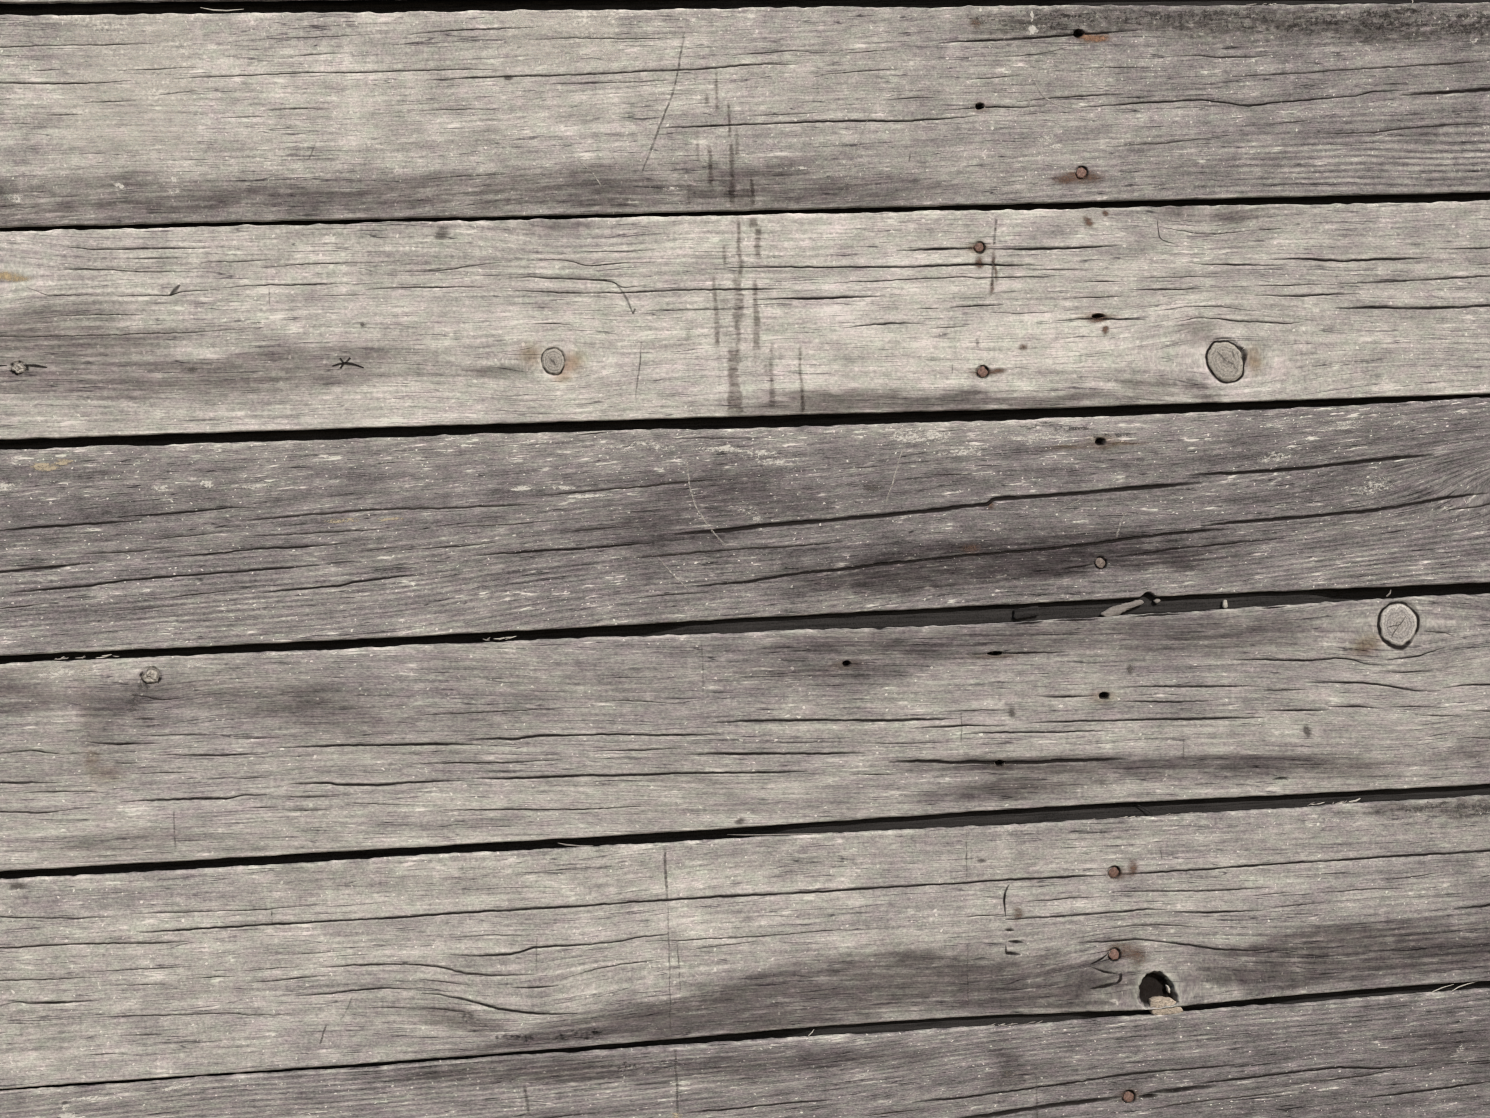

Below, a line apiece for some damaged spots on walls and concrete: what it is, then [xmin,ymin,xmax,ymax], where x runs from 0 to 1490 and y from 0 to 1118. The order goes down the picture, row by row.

crack [0,247,482,375]
crack [0,455,1490,612]
crack [0,850,1490,1055]